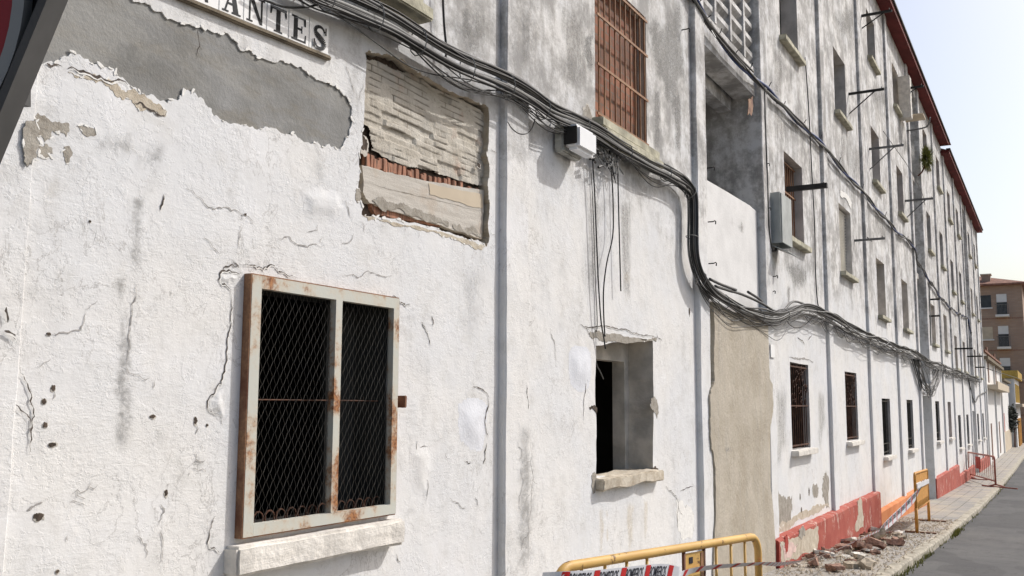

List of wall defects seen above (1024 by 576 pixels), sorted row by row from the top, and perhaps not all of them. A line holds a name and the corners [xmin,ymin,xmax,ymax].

peeling [22,113,97,167]
peeling [42,0,491,250]
crack [52,303,95,335]
crack [160,188,297,424]
spalling [589,330,657,344]
crack [16,360,50,452]
peeling [778,472,830,562]